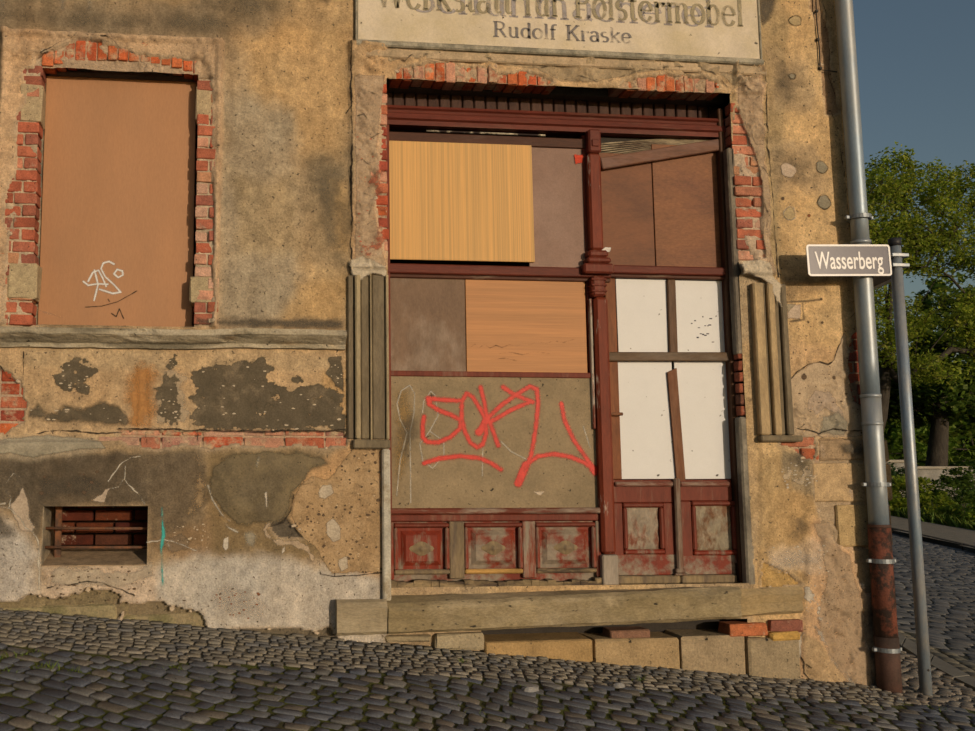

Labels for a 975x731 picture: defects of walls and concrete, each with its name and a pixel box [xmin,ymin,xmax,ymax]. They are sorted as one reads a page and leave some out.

flaking render [1,40,220,327]
flaking render [350,48,781,303]
flaking render [0,370,27,434]
peeling [53,357,98,397]
peeling [99,354,382,593]
flaking render [0,488,35,532]
spalling [0,563,206,627]
spalling [215,588,337,638]